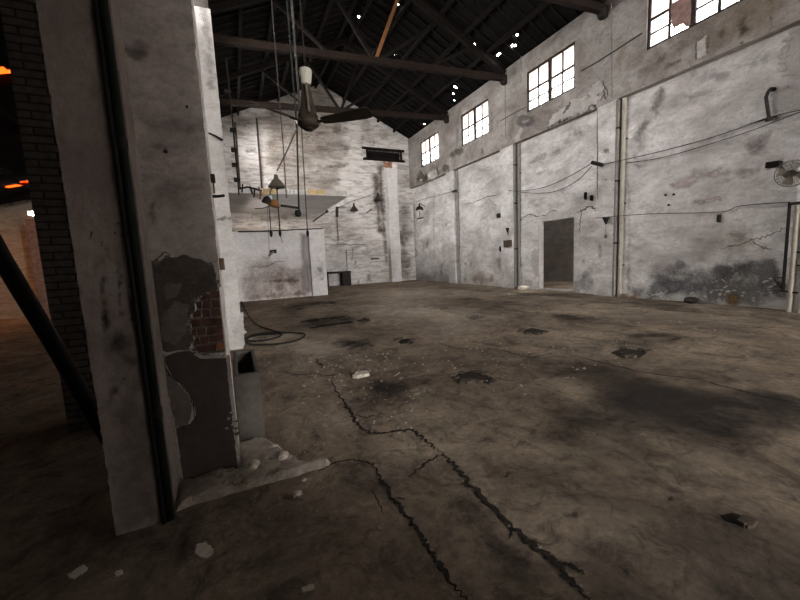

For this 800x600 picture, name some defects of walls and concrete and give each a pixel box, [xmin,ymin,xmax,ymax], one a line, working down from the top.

flaking render [151,255,247,468]
leakage [634,260,787,310]
crack [723,228,782,250]
crack [287,346,590,600]